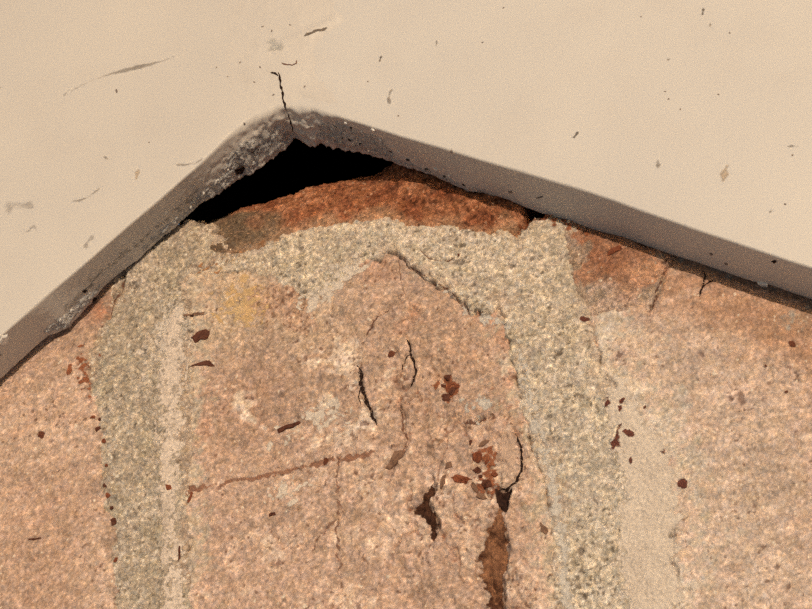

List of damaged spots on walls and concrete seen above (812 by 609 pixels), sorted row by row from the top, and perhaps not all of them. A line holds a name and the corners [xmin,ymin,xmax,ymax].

crack [270,60,297,131]
spalling [191,329,210,343]
crack [402,339,417,386]
crack [356,365,377,425]